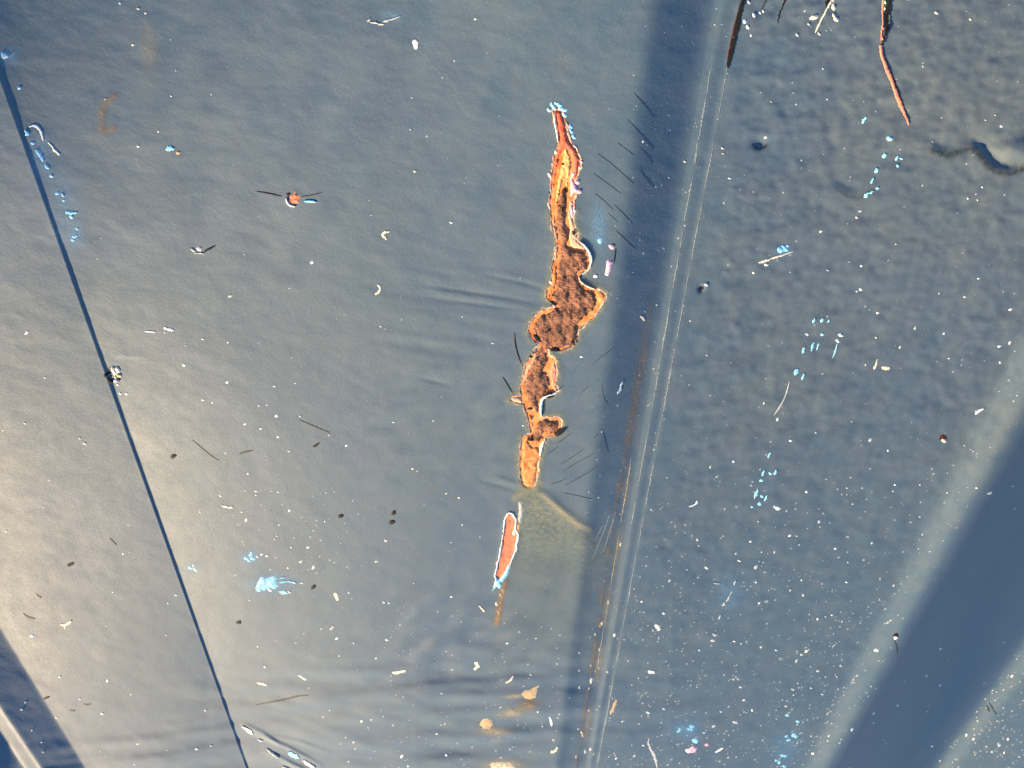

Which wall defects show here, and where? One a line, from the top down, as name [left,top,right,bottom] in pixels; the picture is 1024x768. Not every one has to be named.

peeling [493,102,616,624]